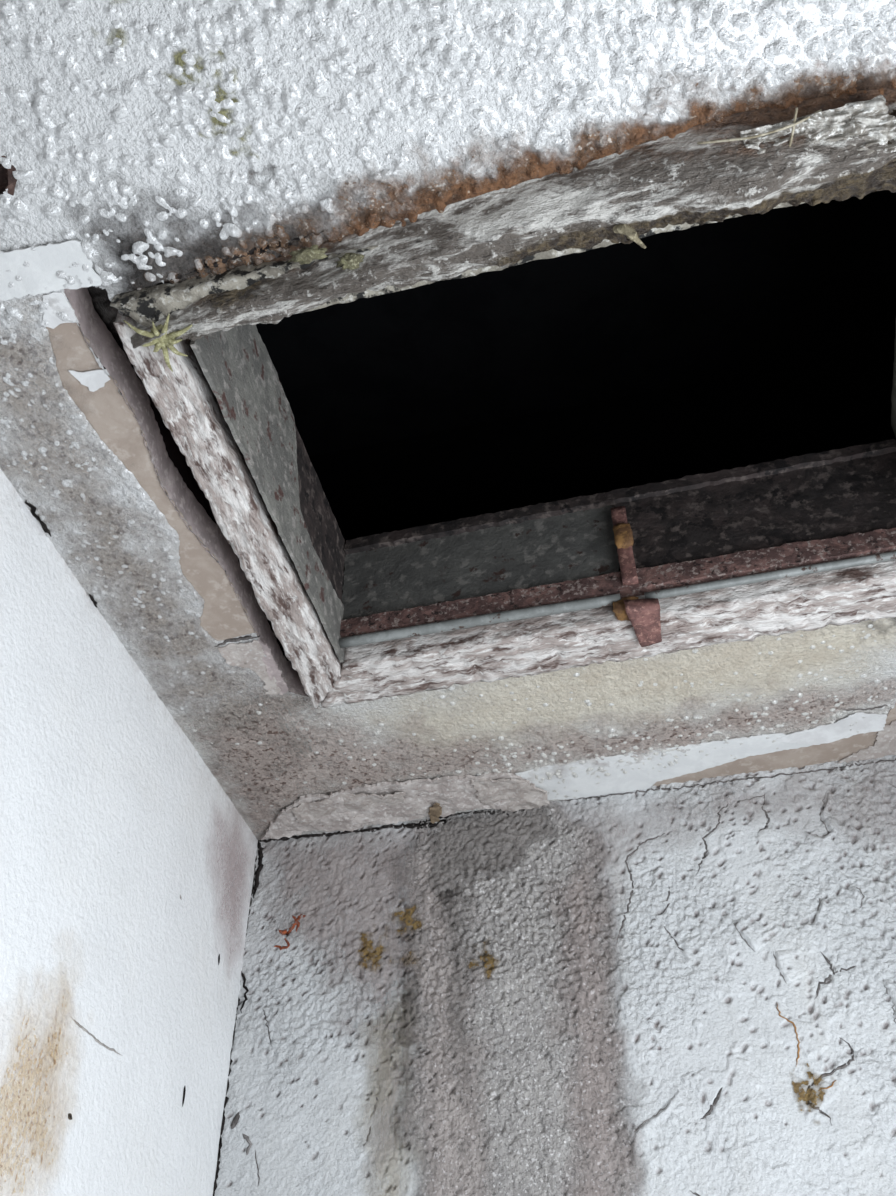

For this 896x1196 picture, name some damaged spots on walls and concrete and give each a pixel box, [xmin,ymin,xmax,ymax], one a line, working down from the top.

corrosion [174,70,896,279]
water stain [0,344,93,498]
peeling [43,292,289,695]
water stain [150,617,896,824]
peeling [261,703,896,840]
water stain [284,801,644,1196]
crack [213,758,896,1196]